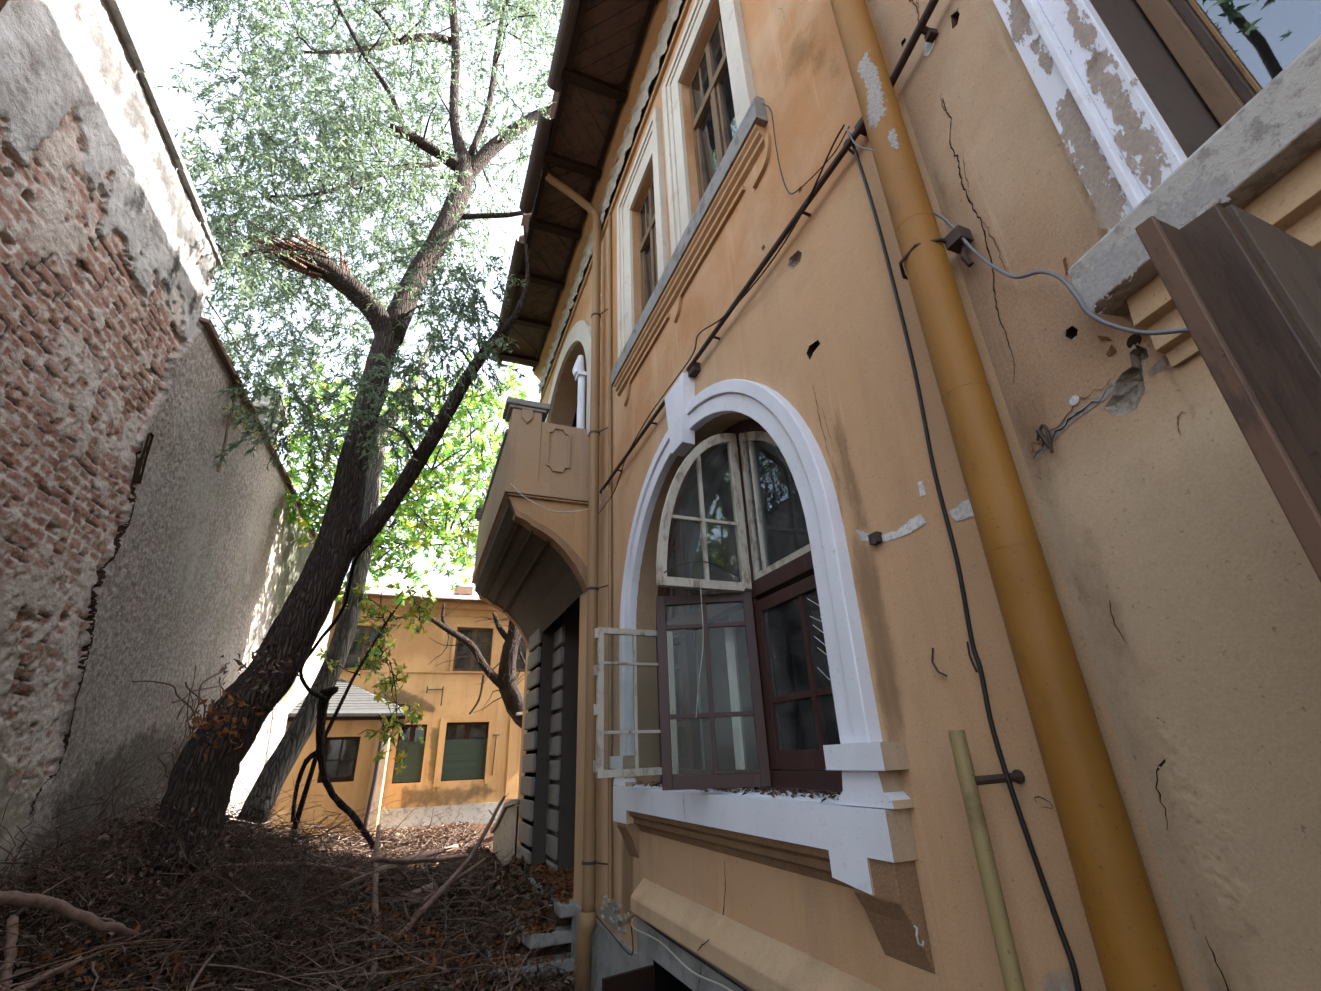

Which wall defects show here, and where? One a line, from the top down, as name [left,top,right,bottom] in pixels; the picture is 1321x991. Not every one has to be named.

peeling [857,50,900,149]
peeling [1004,0,1053,76]
peeling [1055,0,1234,340]
crack [940,97,1015,375]
spalling [132,432,155,484]
flaking render [1031,334,1168,461]
crack [29,441,143,815]